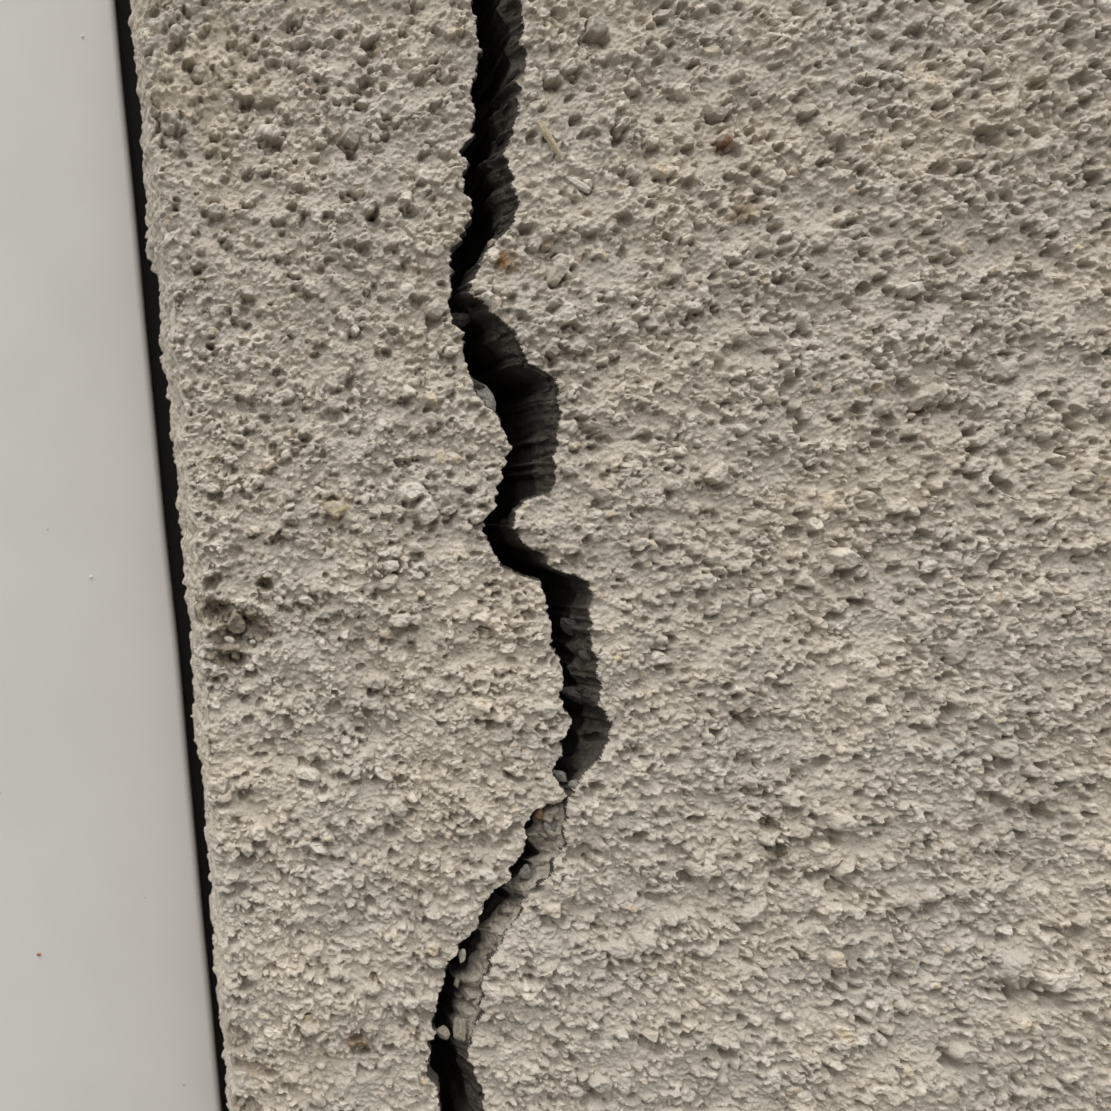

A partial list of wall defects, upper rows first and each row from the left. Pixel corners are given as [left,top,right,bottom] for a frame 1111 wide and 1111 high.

crack [425,0,611,1111]